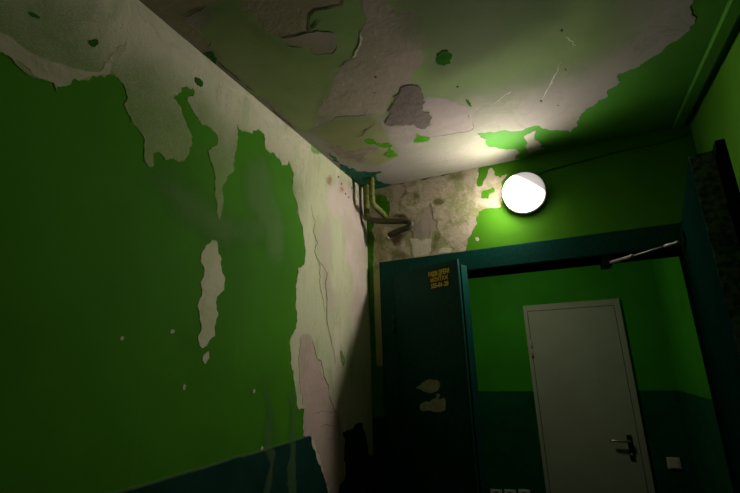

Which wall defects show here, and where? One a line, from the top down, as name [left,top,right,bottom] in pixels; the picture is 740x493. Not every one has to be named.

peeling [139,0,696,186]
peeling [0,0,507,493]
crack [311,205,343,430]